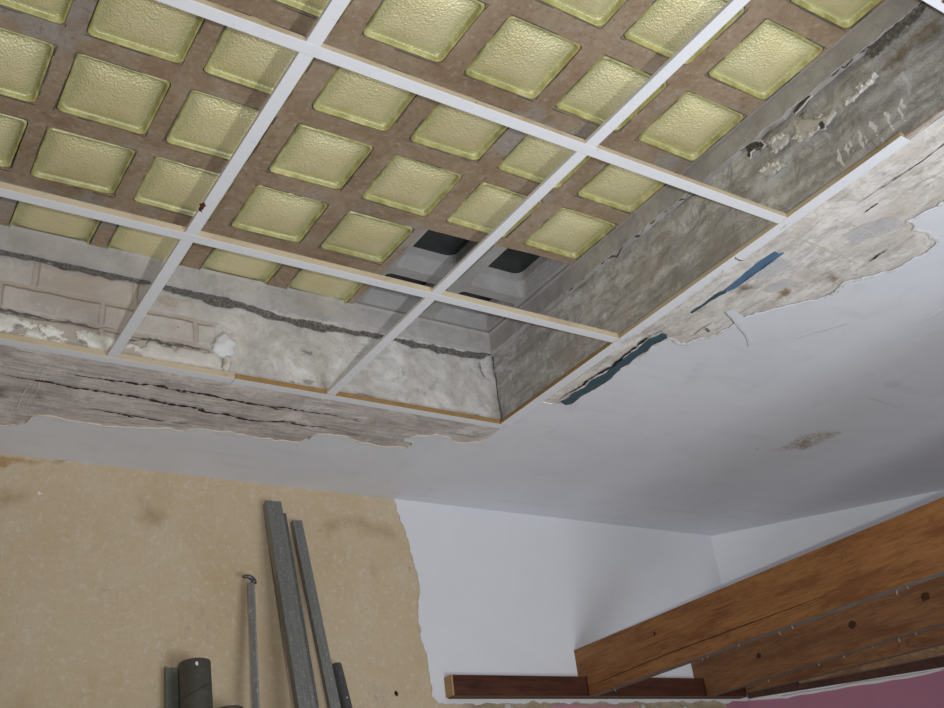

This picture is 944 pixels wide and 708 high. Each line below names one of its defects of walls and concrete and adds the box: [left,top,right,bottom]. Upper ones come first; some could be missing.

peeling [745,71,879,176]
peeling [543,113,944,405]
crack [0,308,209,352]
crack [5,363,372,436]
peeling [0,344,499,449]
peeling [394,499,732,708]